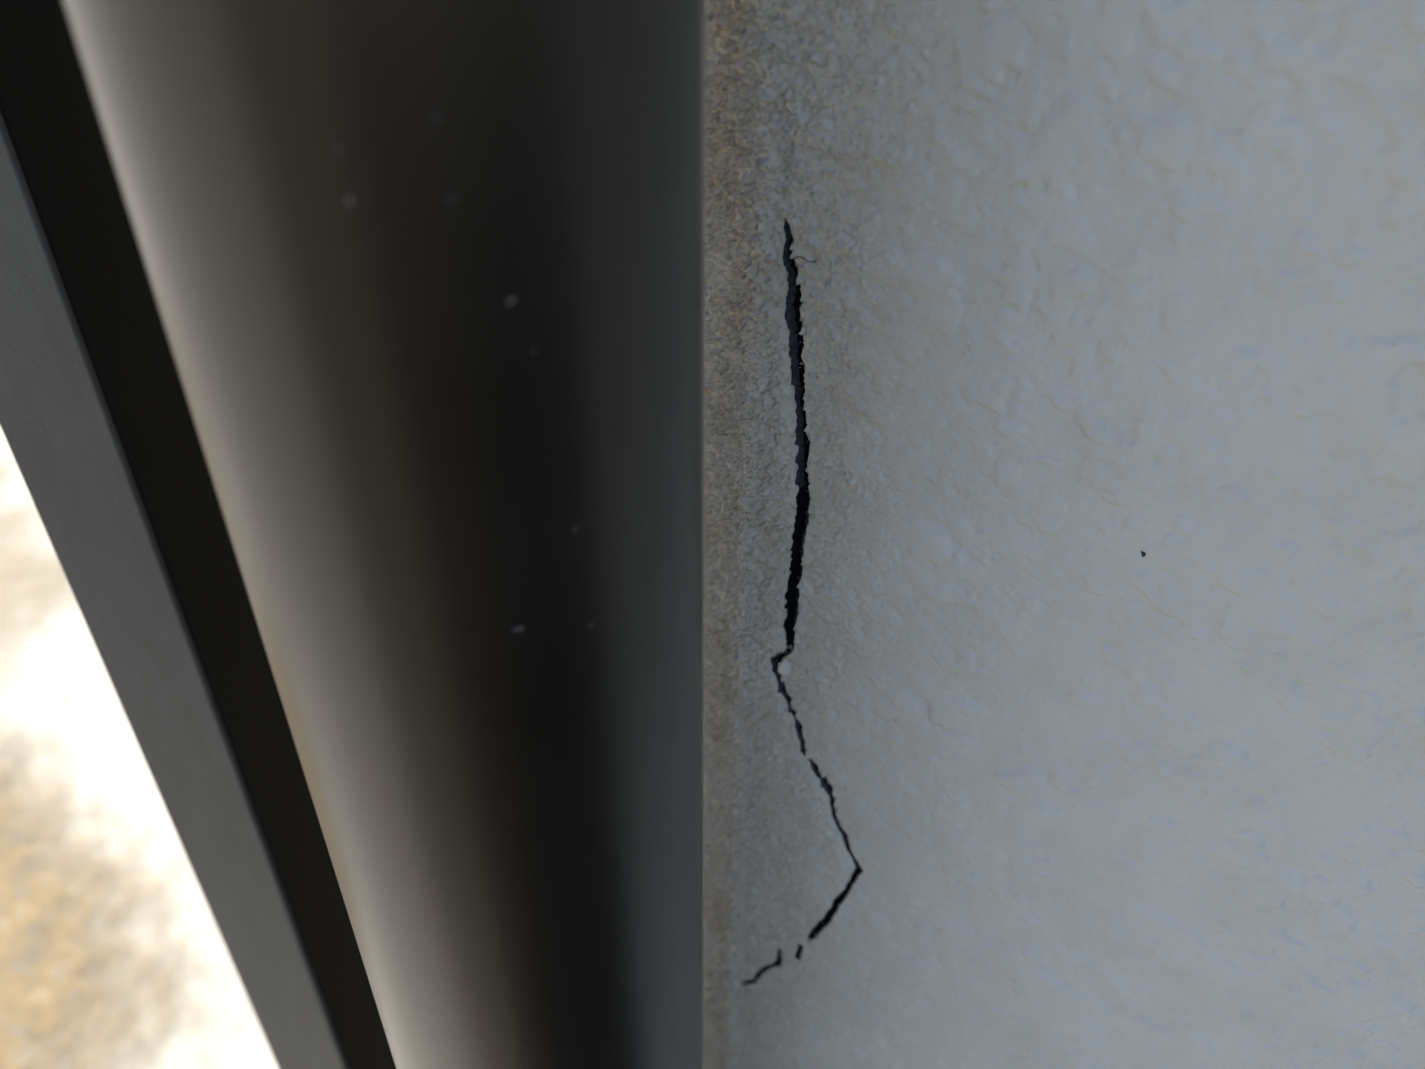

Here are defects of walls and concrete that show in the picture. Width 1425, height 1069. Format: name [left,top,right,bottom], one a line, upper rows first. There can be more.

crack [742,220,862,986]